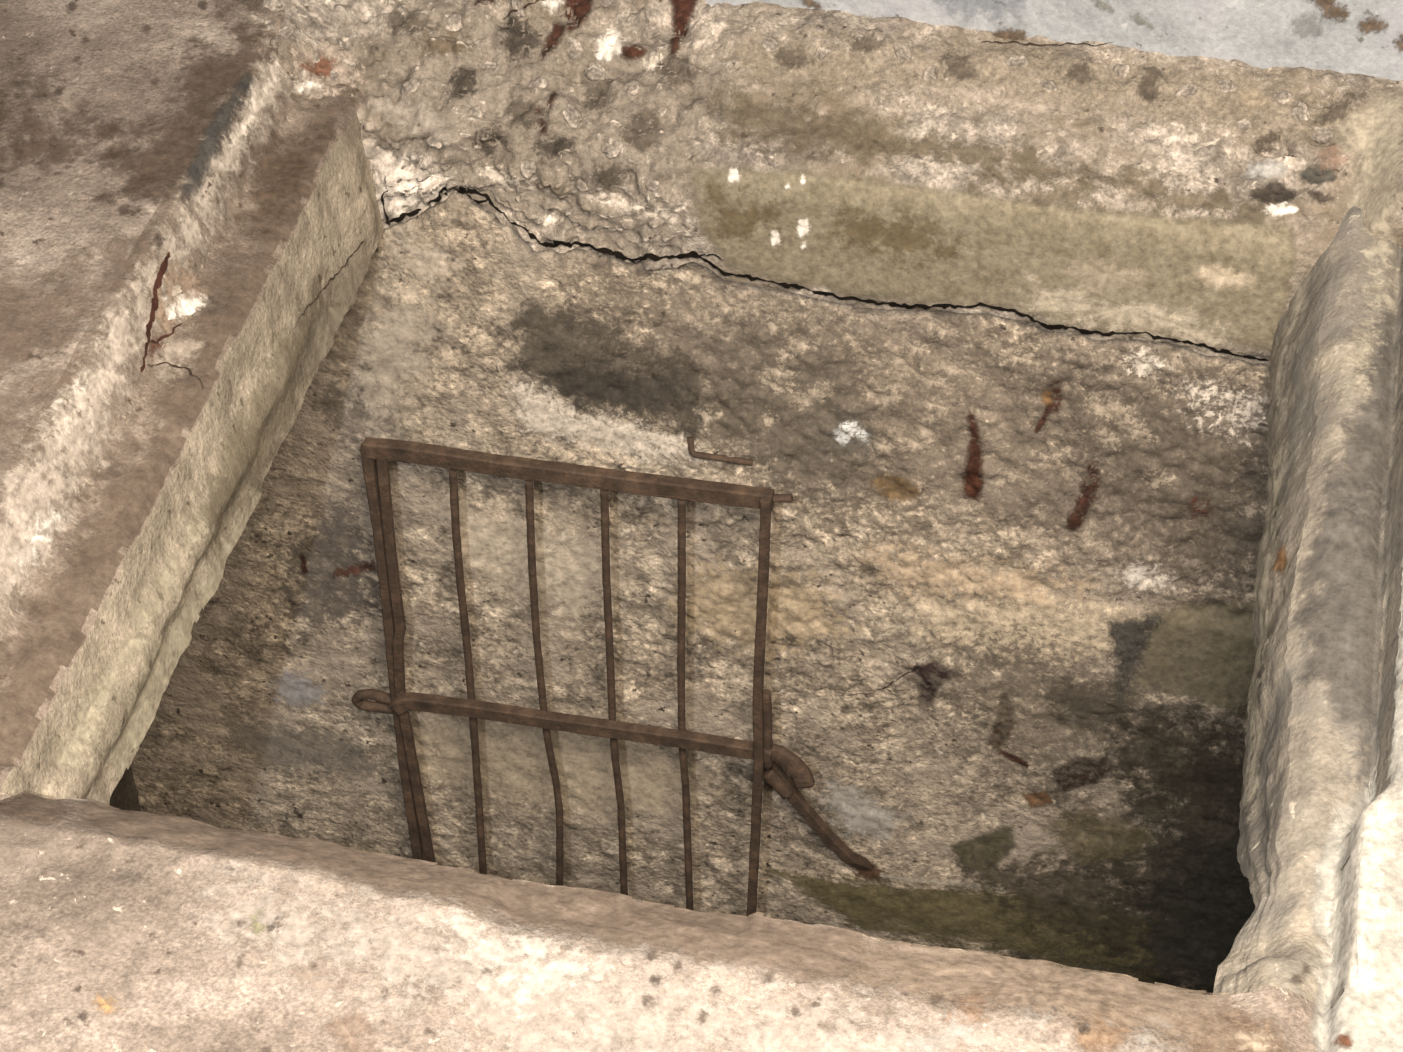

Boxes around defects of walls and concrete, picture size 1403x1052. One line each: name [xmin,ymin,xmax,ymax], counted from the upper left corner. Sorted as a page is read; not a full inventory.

corrosion [541,0,591,56]
corrosion [622,45,646,60]
corrosion [670,0,697,55]
crack [294,176,1269,361]
corrosion [1035,381,1063,433]
corrosion [963,414,983,500]
corrosion [1067,461,1101,530]
damp [495,259,1309,992]